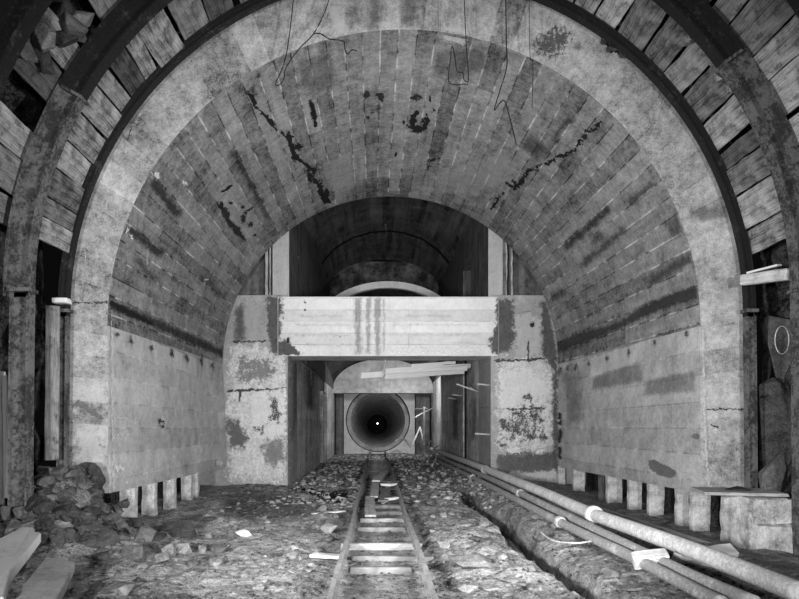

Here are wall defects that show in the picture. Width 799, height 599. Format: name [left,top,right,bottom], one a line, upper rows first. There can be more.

spalling [309,100,318,127]
spalling [402,94,436,134]
crack [246,88,332,205]
crack [490,120,602,210]
crack [227,387,287,401]
water stain [496,286,696,480]
water stain [225,419,250,449]